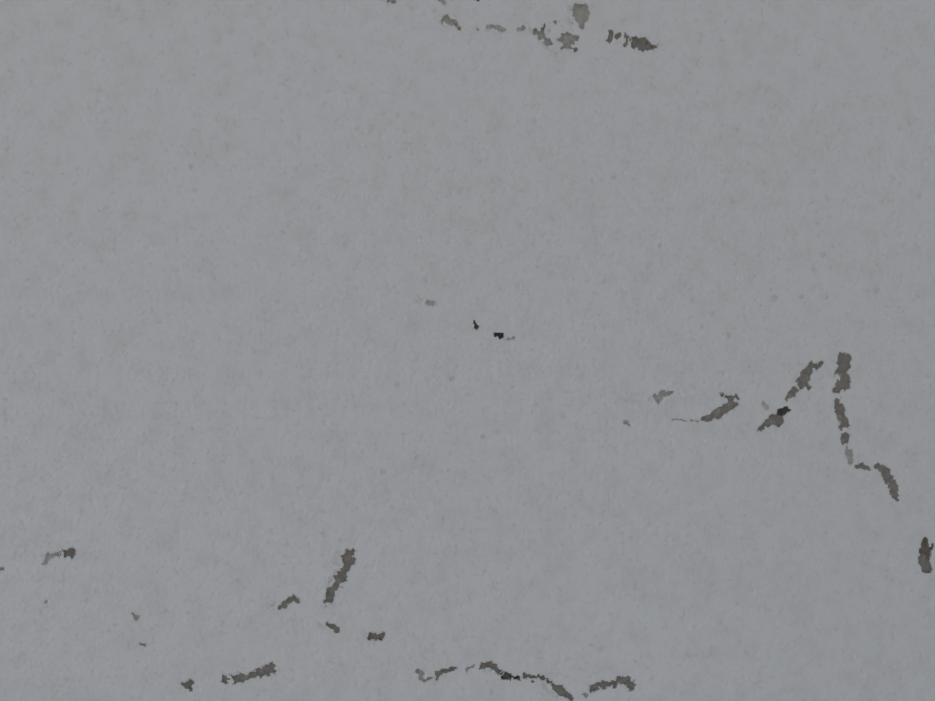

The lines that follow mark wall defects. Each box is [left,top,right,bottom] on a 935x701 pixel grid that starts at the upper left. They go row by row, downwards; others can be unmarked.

crack [436,2,660,59]
crack [757,351,900,503]
crack [265,593,637,701]